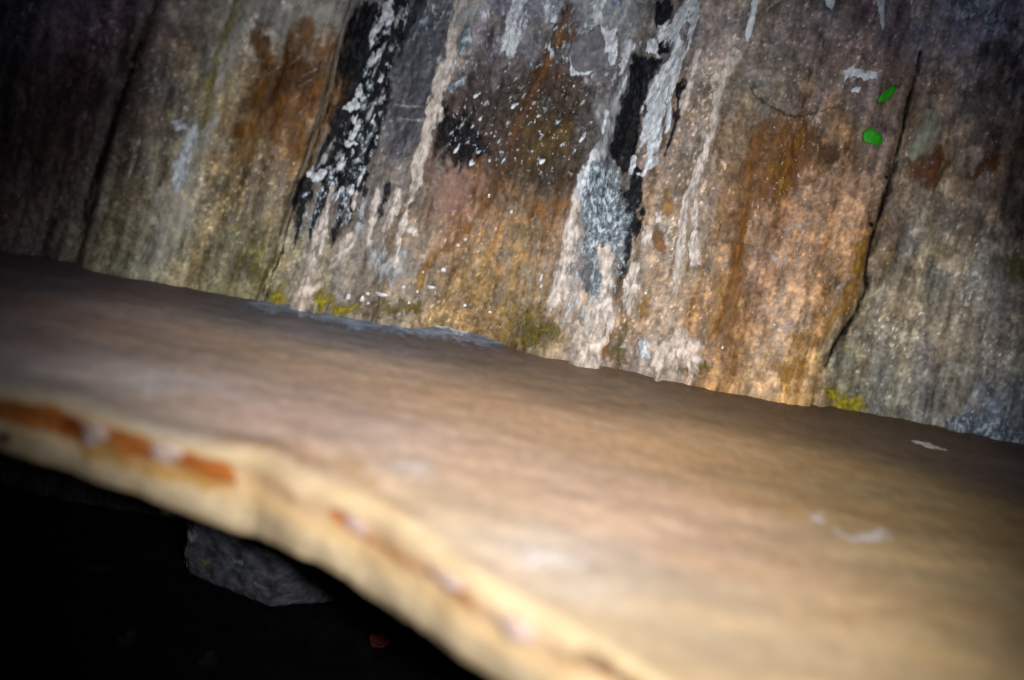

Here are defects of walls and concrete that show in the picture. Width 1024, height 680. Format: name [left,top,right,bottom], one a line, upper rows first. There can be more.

rust [222,18,336,162]
water stain [294,0,490,305]
water stain [501,0,527,58]
water stain [533,0,702,348]
water stain [672,0,758,293]
rust [707,113,857,356]
rust [771,242,867,393]
crack [819,50,921,381]
rust [0,399,236,490]